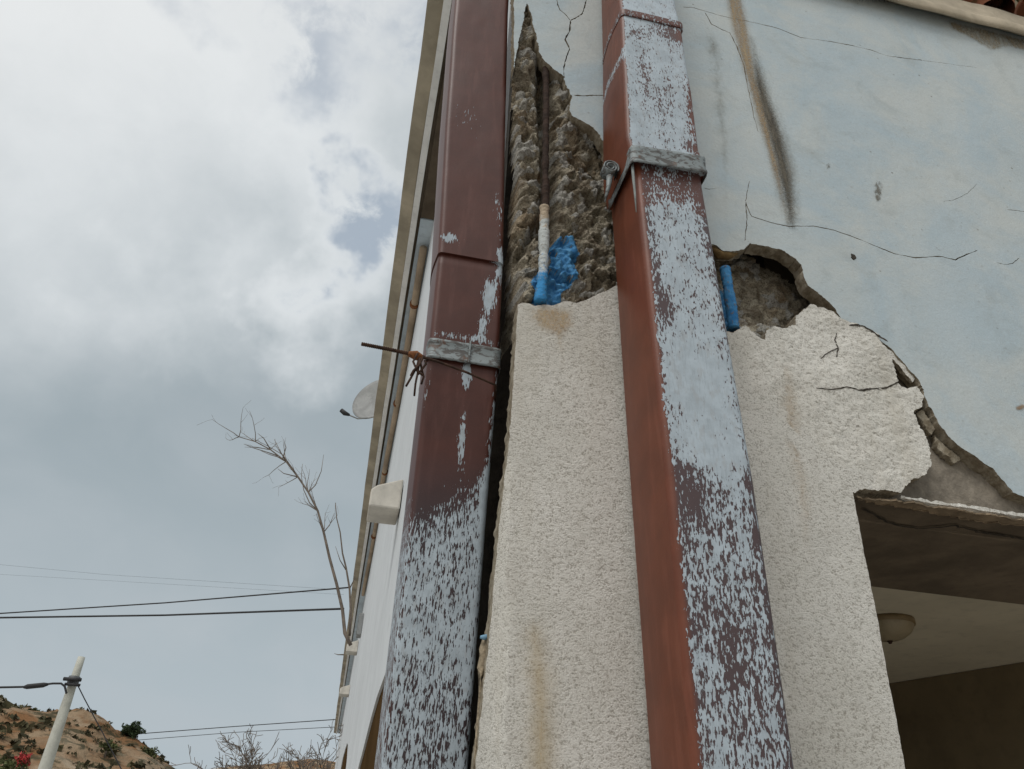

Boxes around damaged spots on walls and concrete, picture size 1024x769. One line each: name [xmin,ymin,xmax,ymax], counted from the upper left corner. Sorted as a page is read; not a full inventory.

spalling [499,12,617,359]
spalling [712,246,811,338]
crack [821,324,888,359]
crack [816,382,898,391]
peeling [884,345,915,388]
peeling [857,410,1024,526]